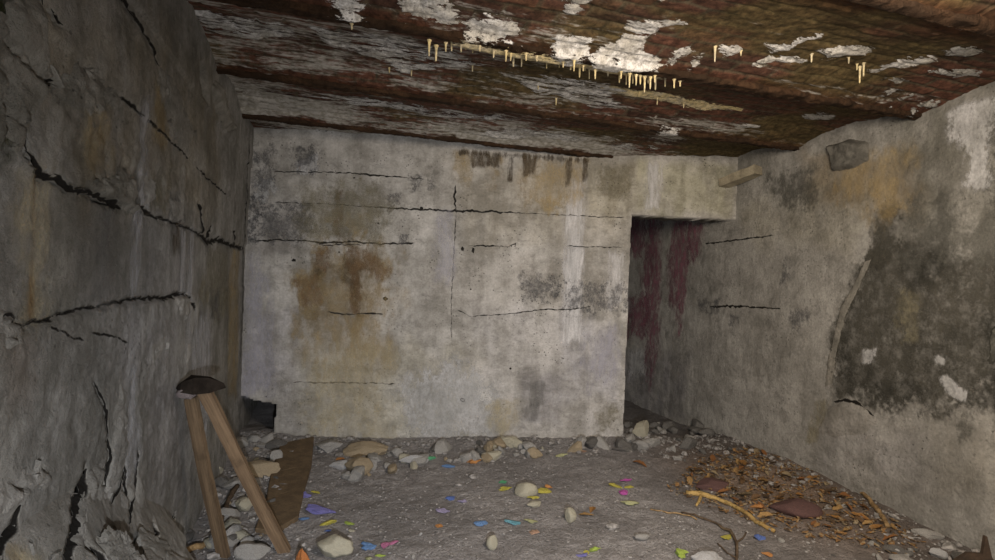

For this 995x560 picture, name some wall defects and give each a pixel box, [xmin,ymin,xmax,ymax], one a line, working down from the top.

crack [41,0,63,25]
crack [121,0,159,65]
leakage [309,0,743,111]
leakage [753,33,984,117]
leakage [307,94,585,181]
leakage [948,98,995,190]
crack [3,96,422,376]
crack [277,186,623,337]
leakage [520,125,702,390]
leakage [830,180,995,419]
spalling [0,459,52,523]
crack [62,382,176,560]